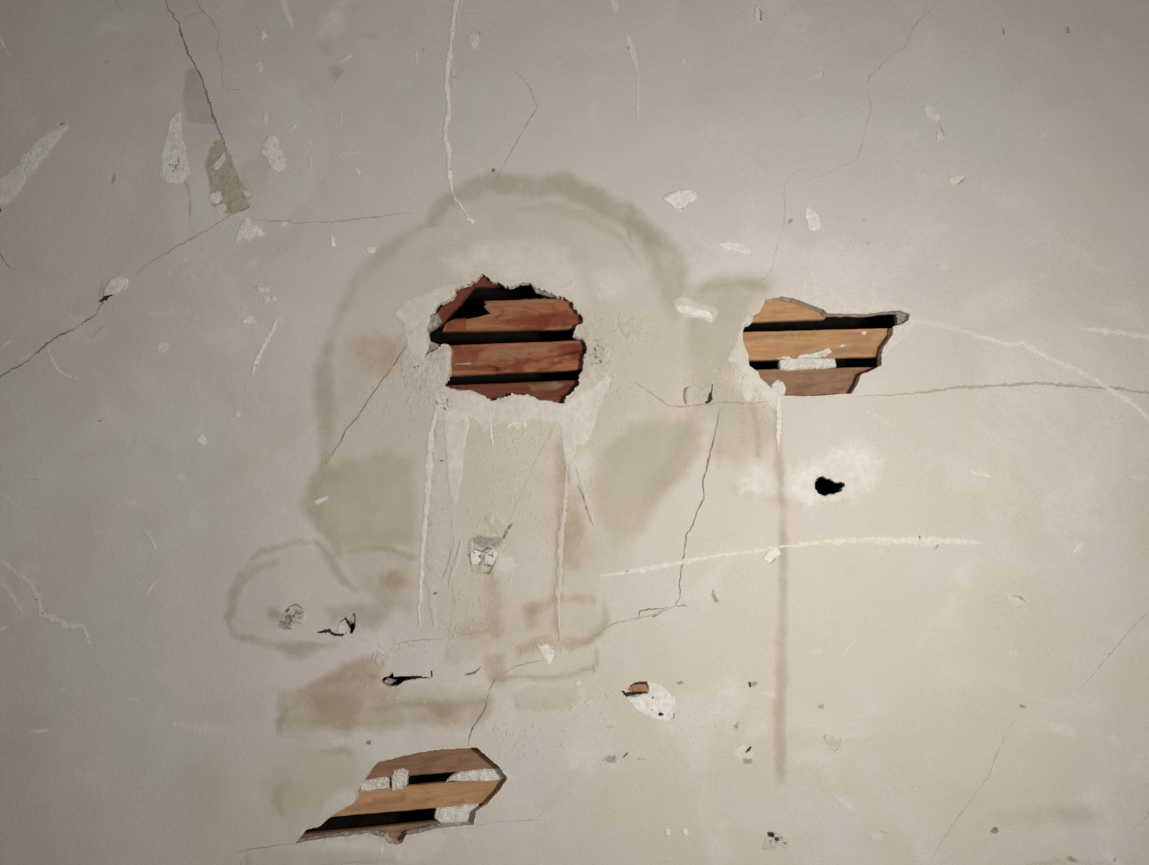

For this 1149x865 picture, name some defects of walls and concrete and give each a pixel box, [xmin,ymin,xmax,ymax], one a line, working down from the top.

crack [166,2,227,150]
crack [0,302,104,378]
flaking render [729,273,912,451]
crack [861,382,1149,397]
flaking render [357,272,654,627]
flaking render [787,442,877,507]
flaking render [622,681,675,721]
flaking render [293,746,517,862]